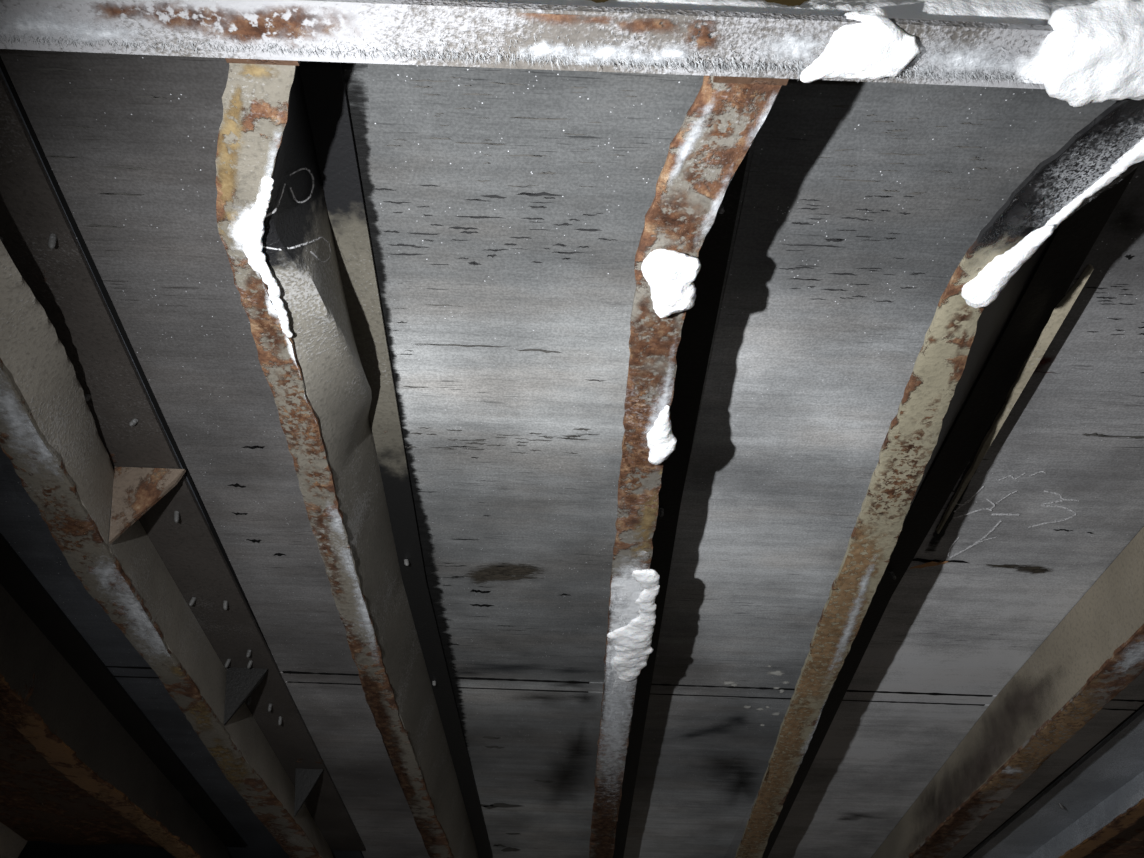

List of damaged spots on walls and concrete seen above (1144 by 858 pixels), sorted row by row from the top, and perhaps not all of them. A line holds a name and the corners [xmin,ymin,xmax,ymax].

corrosion [100,5,137,17]
corrosion [154,7,306,40]
corrosion [657,196,703,252]
leakage [994,112,1116,235]
corrosion [248,277,282,355]
corrosion [278,370,325,496]
leakage [342,64,469,747]
corrosion [622,301,674,501]
corrosion [868,401,937,519]
leakage [926,396,1007,551]
corrosion [794,526,881,705]
corrosion [363,676,435,857]